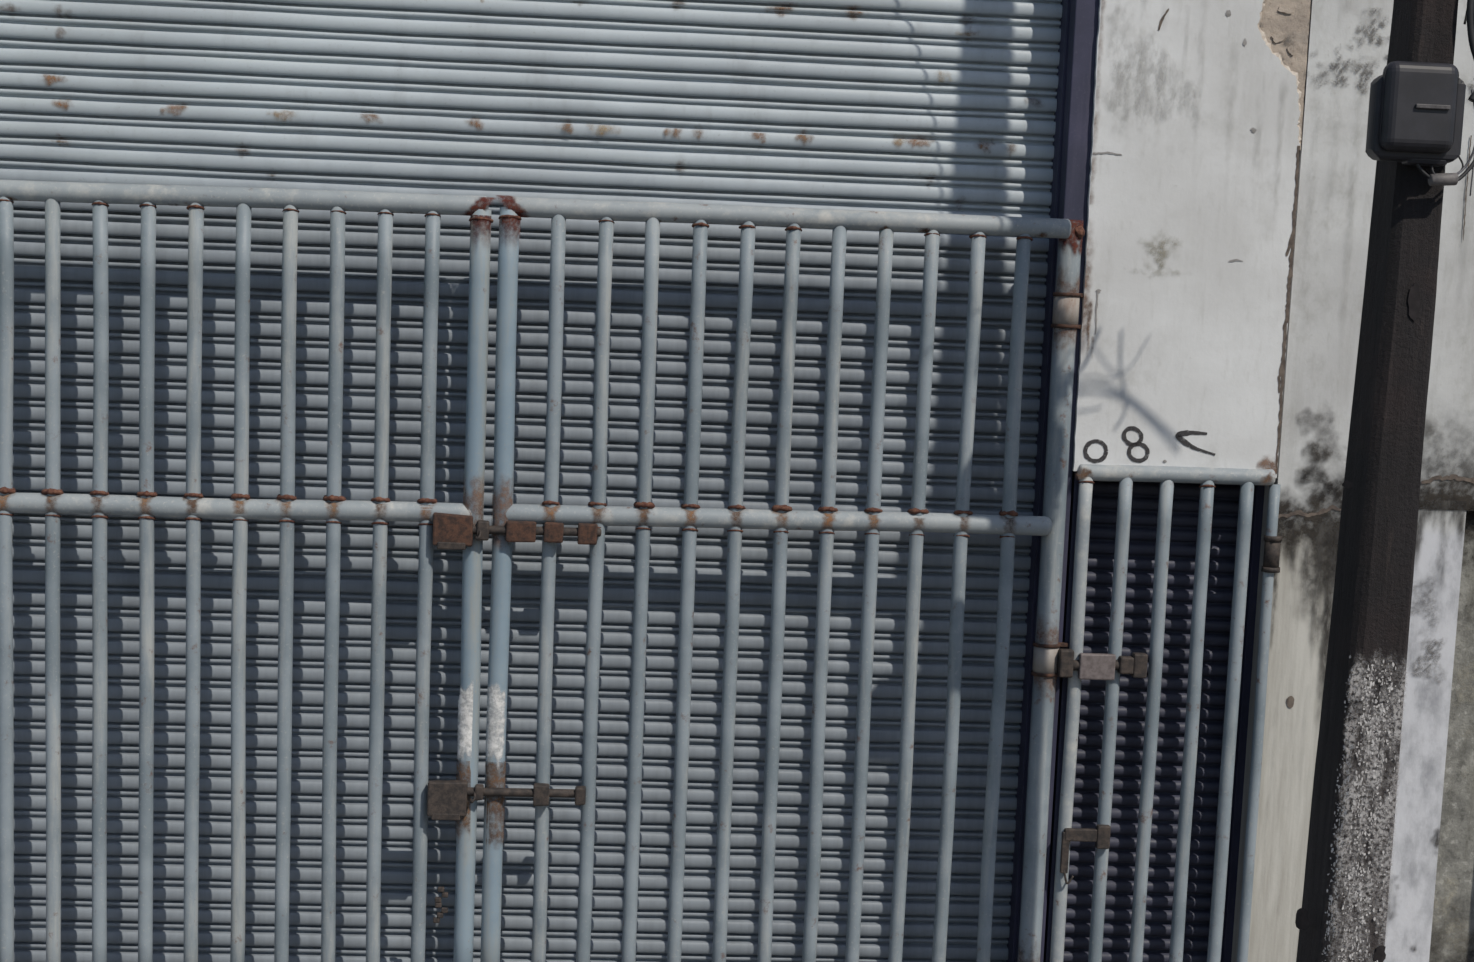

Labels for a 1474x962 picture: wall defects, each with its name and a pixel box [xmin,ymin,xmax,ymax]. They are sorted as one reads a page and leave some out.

spalling [1243,0,1311,151]
damp [1277,443,1344,683]
damp [1415,458,1474,563]